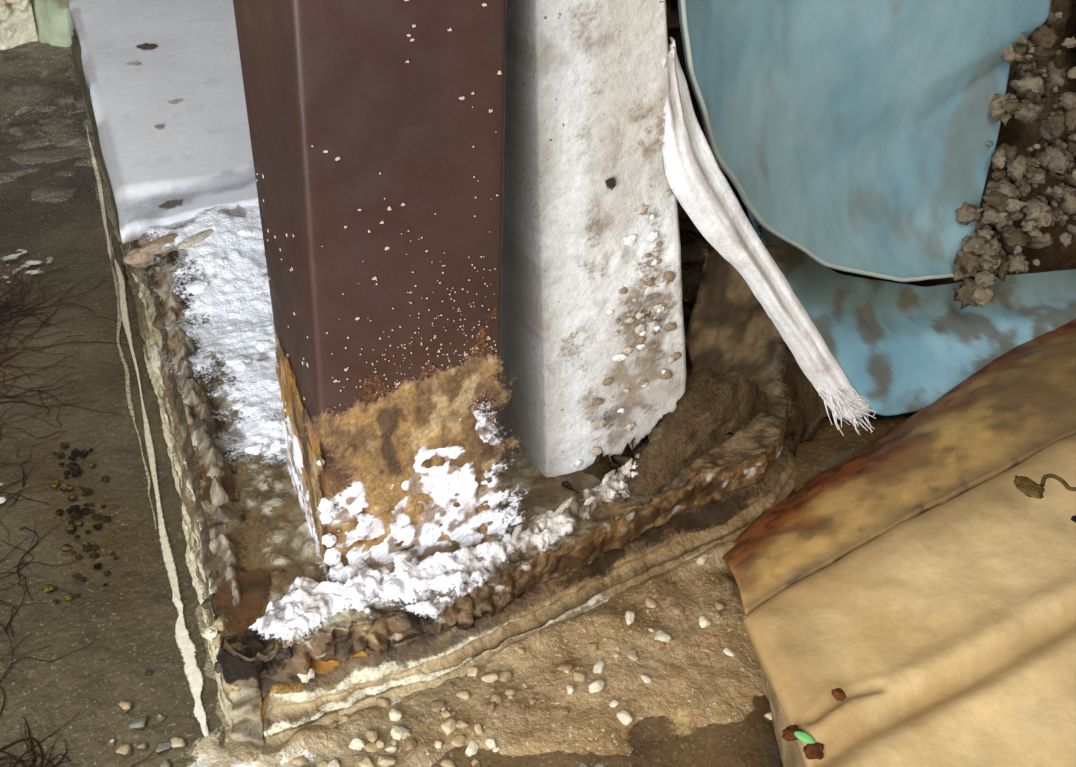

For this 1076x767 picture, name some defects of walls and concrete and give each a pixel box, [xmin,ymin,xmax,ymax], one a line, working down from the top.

damp [634,109,665,159]
corrosion [269,307,519,572]
damp [86,125,766,767]
spalling [200,593,294,691]
spalling [297,668,315,683]